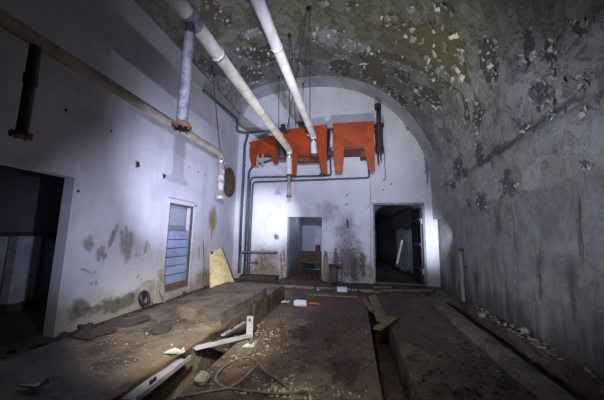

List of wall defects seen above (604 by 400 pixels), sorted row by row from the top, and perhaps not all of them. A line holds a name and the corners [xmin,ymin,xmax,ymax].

peeling [197,59,228,83]
peeling [229,27,278,84]
peeling [310,5,485,171]
peeling [518,26,591,121]
peeling [450,152,468,190]
damp [334,223,373,281]
damp [69,293,136,321]